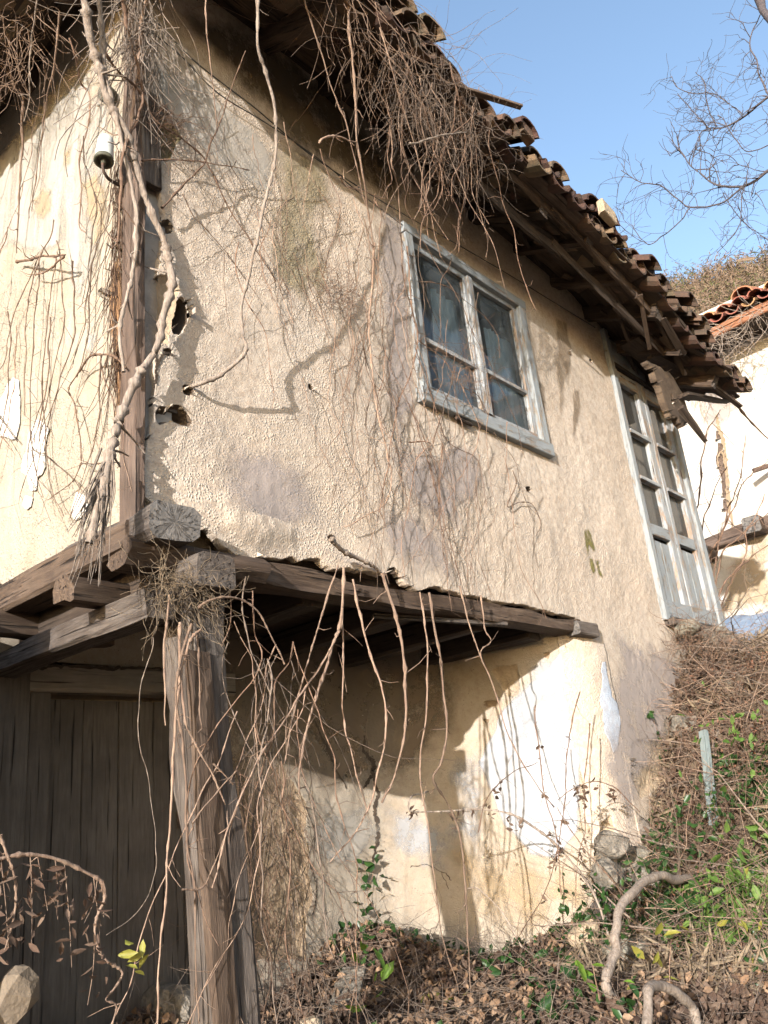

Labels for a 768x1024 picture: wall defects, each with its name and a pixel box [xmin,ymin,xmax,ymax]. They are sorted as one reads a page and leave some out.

spalling [156,275,187,356]
peeling [0,378,49,510]
hole [156,385,194,427]
crack [314,721,380,862]
peeling [479,652,614,858]
peeling [600,662,621,752]